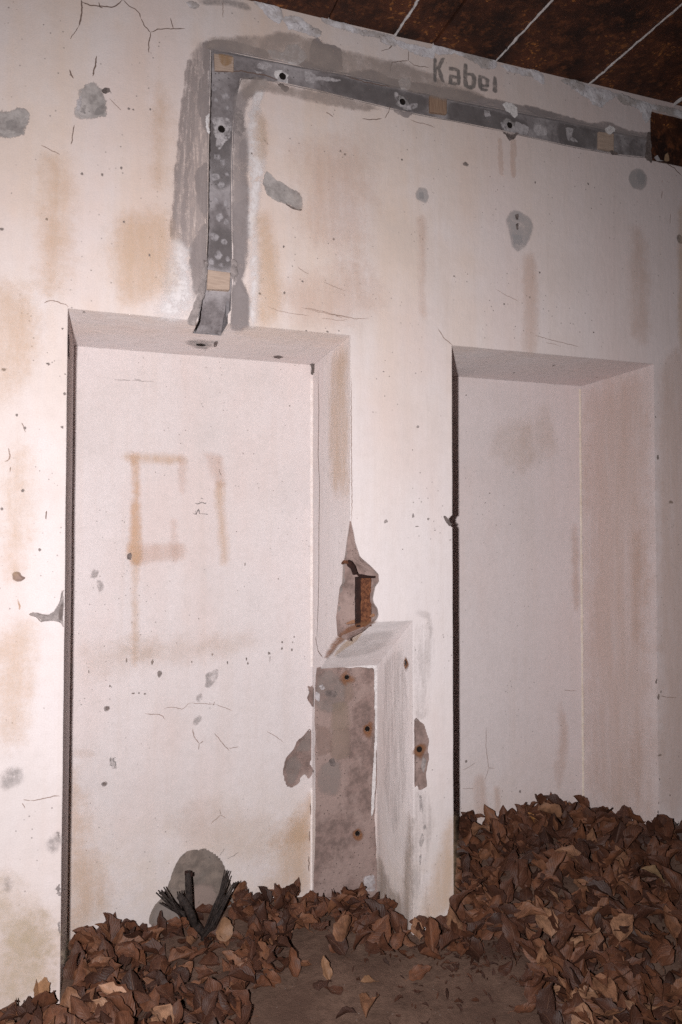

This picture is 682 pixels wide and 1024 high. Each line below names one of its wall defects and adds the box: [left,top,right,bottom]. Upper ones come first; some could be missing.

crack [70,0,185,52]
spalling [0,108,30,138]
spalling [74,83,111,119]
peeling [561,78,682,189]
spalling [263,172,302,211]
spalling [507,212,532,250]
spalling [336,521,379,641]
crack [150,702,232,718]
spalling [414,718,429,790]
peeling [283,667,377,901]